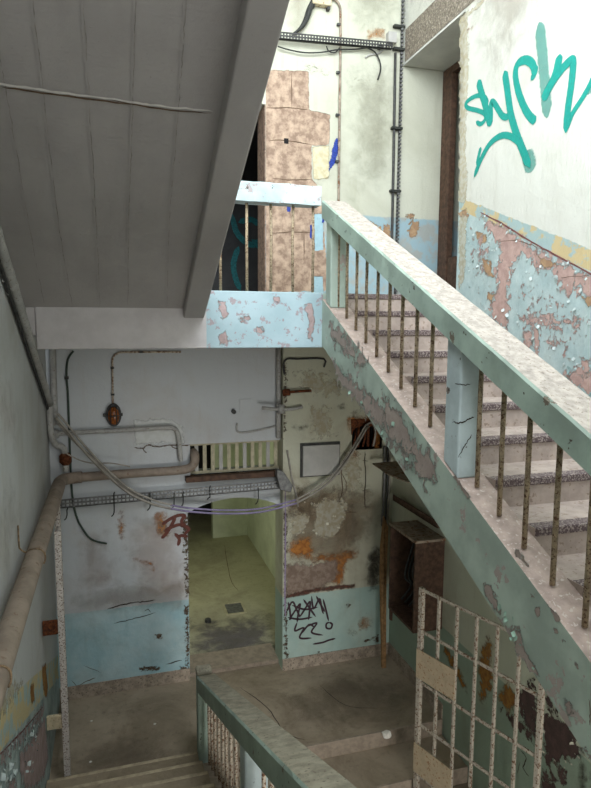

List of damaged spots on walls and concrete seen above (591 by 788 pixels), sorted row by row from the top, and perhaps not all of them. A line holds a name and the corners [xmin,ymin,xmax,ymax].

crack [0,83,213,113]
spalling [258,70,331,186]
peeling [458,0,591,397]
spalling [258,198,326,304]
peeling [218,300,229,320]
peeling [304,303,315,342]
peeling [328,319,440,493]
spalling [283,498,348,571]
rust [290,538,356,585]
water stain [368,549,380,587]
peeling [483,582,591,788]
peeling [0,703,49,788]